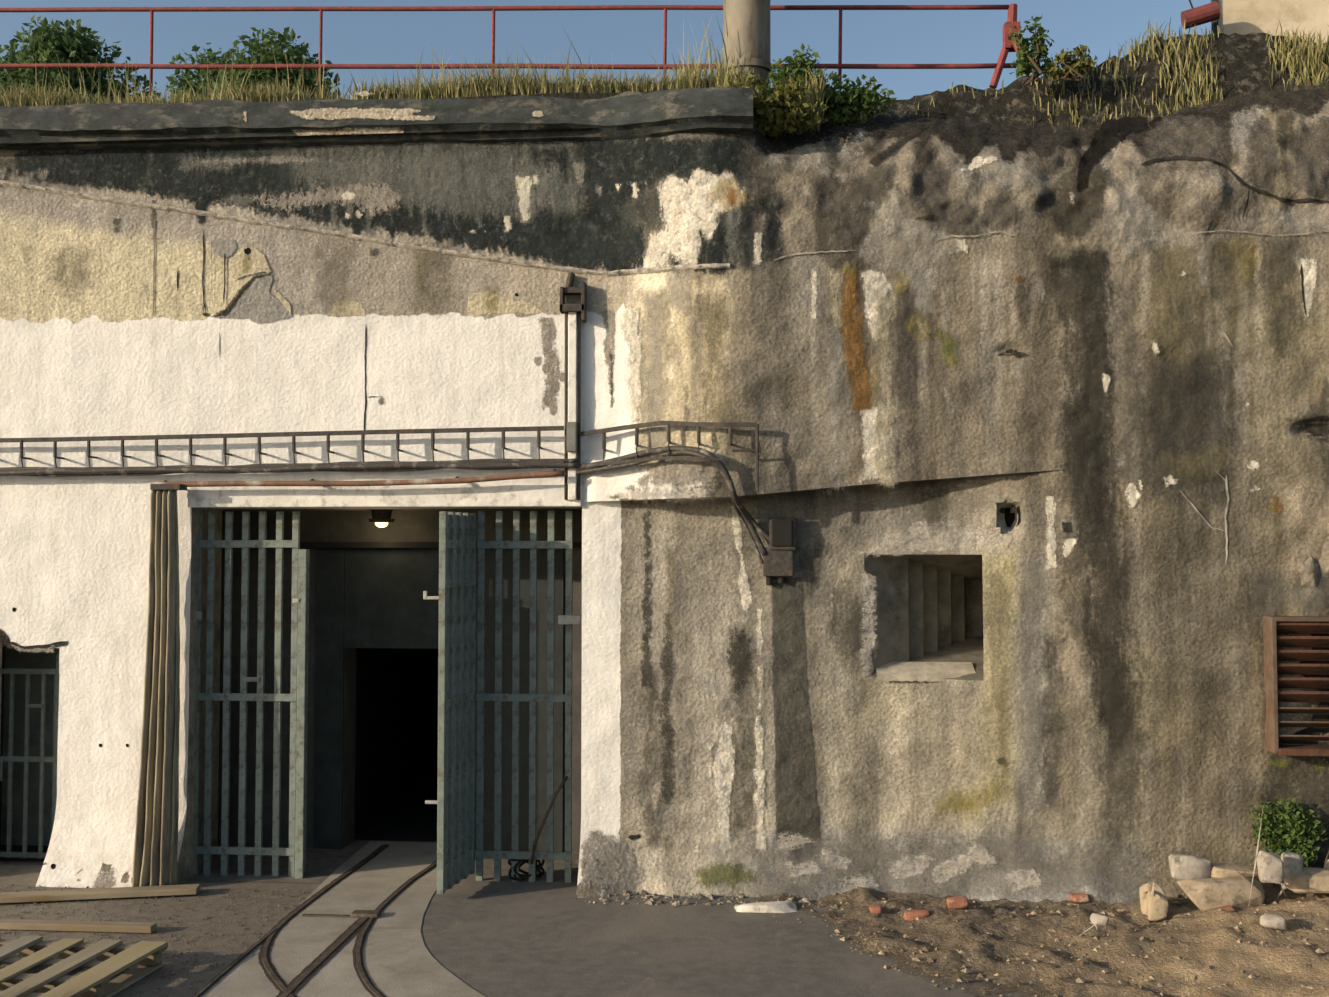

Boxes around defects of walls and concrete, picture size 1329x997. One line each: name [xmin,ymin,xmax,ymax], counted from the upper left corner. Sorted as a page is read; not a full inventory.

peeling [209,239,292,324]
peeling [467,291,565,415]
damp [0,78,1329,275]
crack [775,250,852,260]
rust [838,270,880,421]
damp [860,270,916,486]
crack [928,231,1013,243]
crack [1105,156,1329,314]
damp [1045,246,1140,748]
spalling [0,629,69,652]
damp [710,506,821,851]
damp [706,722,735,855]